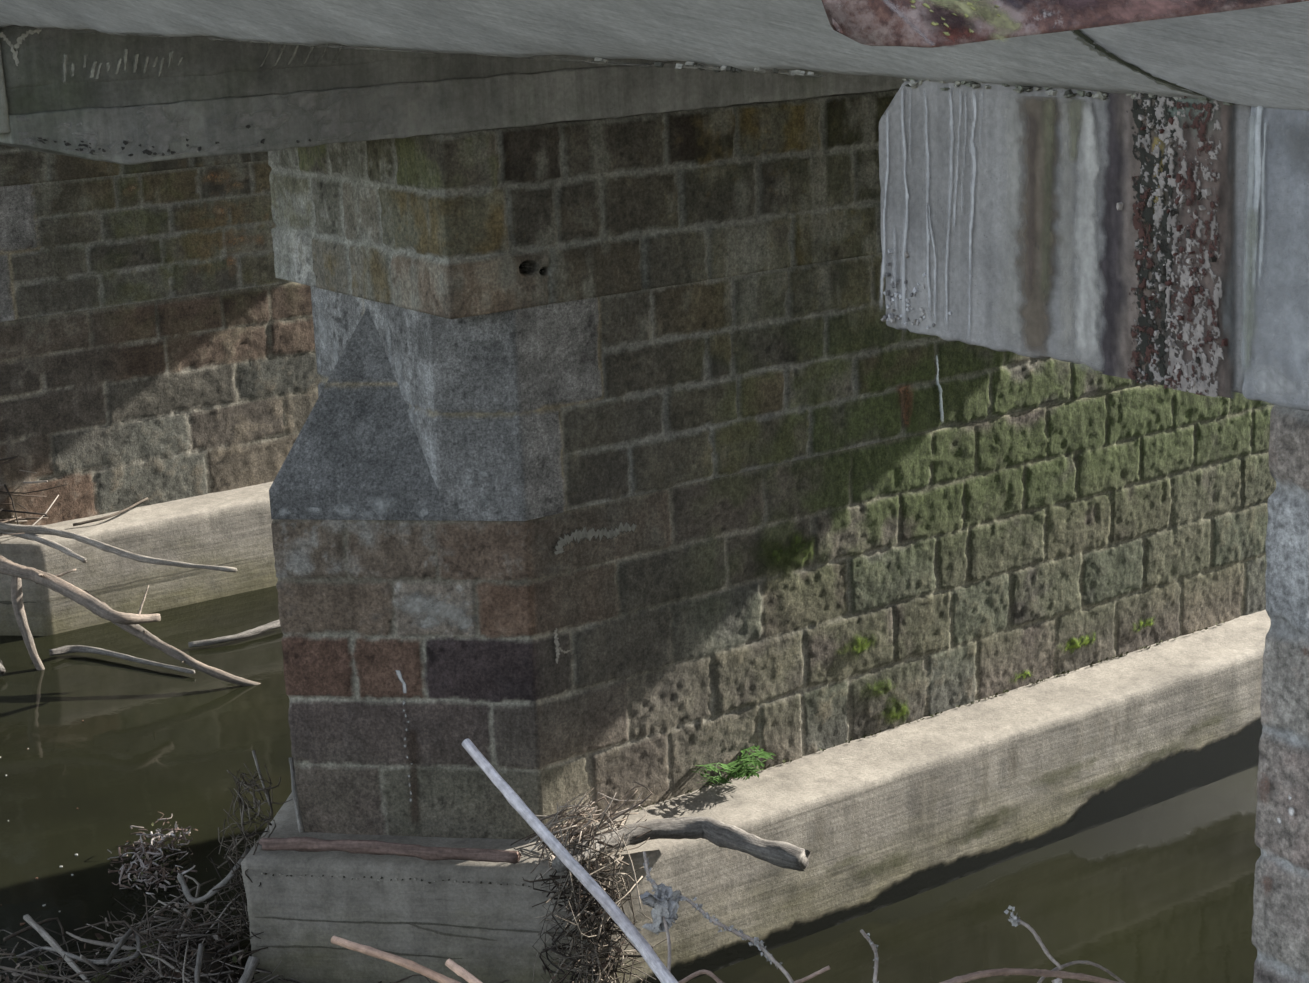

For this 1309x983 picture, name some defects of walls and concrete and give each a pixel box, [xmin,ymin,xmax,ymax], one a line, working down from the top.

water stain [881,88,909,318]
water stain [925,93,977,328]
spalling [902,78,1108,100]
water stain [999,97,1099,359]
rust [1099,93,1234,399]
water stain [633,717,1263,983]